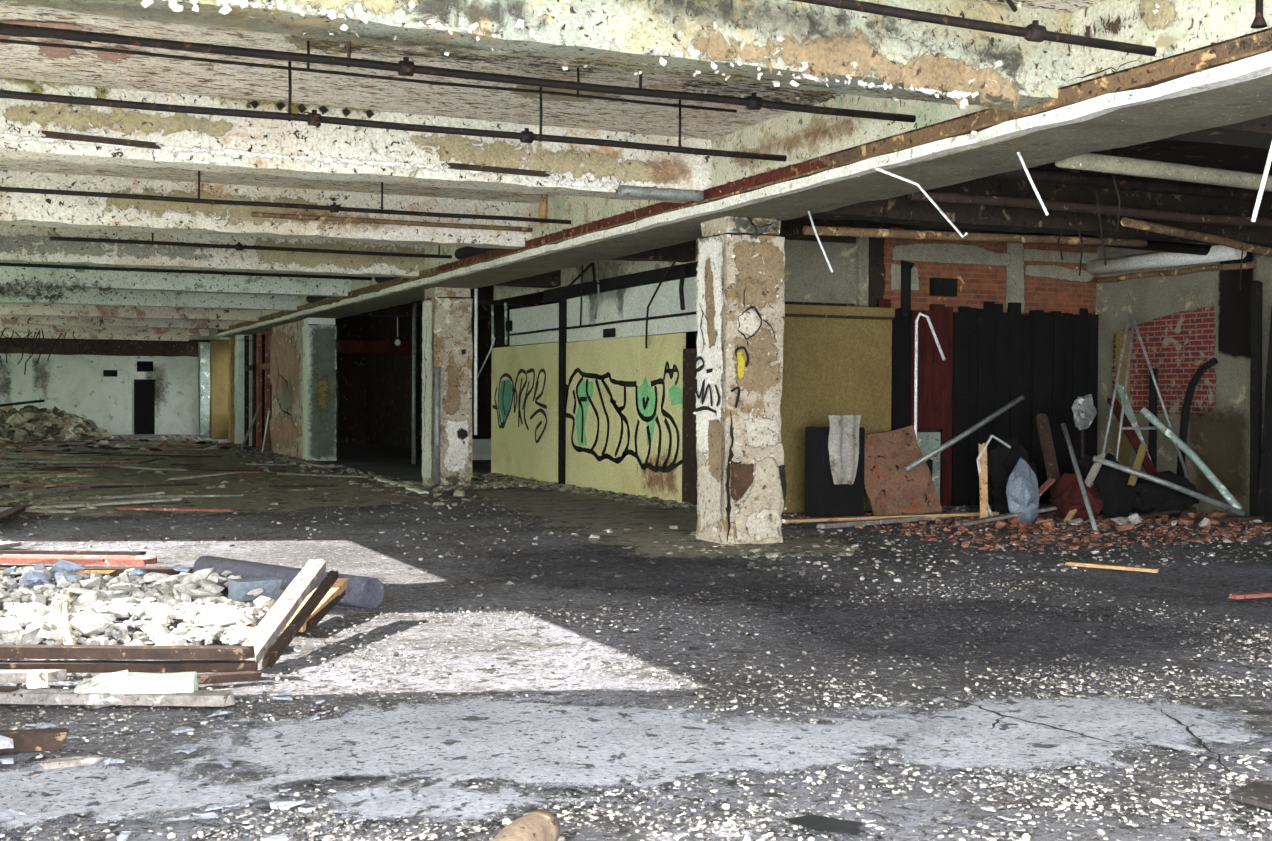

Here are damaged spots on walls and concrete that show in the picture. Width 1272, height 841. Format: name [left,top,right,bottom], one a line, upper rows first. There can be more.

peeling [0,20,134,63]
spalling [141,0,199,12]
damp [402,0,547,42]
peeling [217,0,1023,110]
corrosion [1227,28,1272,51]
peeling [0,185,425,274]
flaking render [704,240,786,394]
spalling [457,415,469,440]
peeling [699,419,754,521]